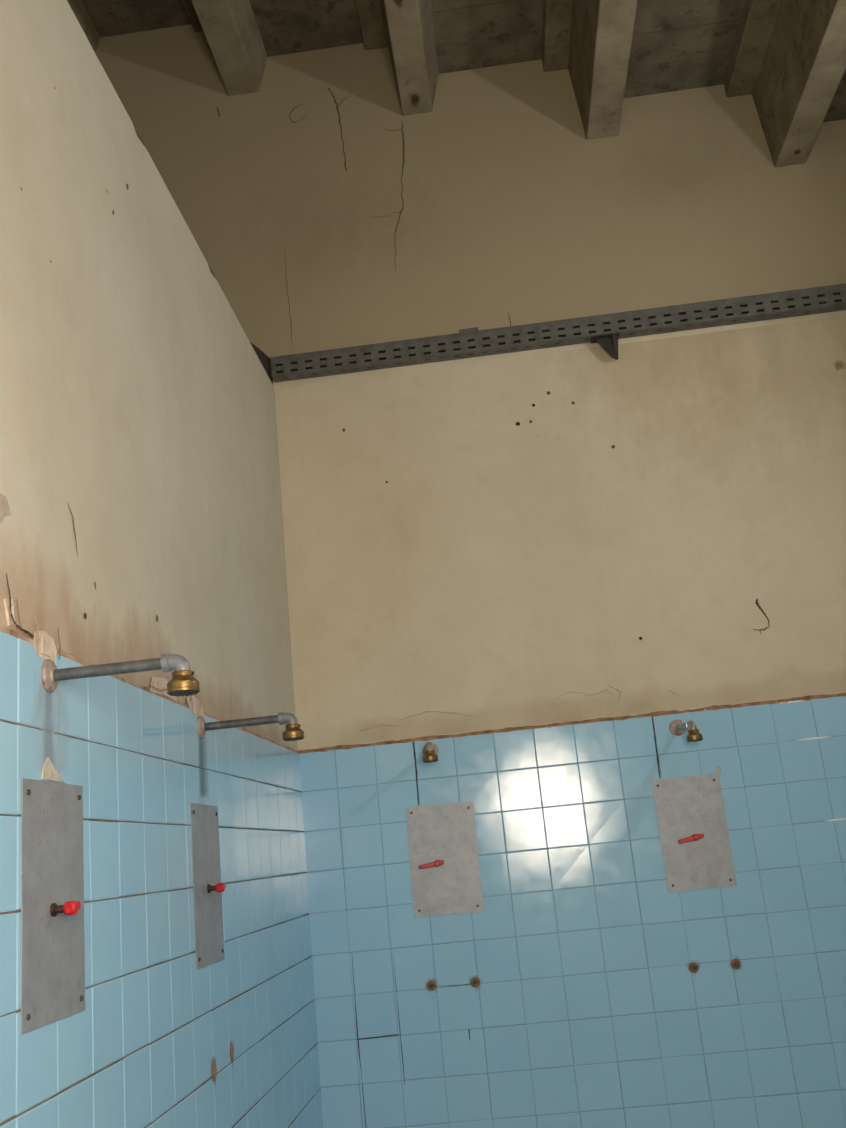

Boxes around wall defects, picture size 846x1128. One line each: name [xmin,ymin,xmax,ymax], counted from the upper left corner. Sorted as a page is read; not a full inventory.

crack [328,88,350,171]
crack [371,122,405,268]